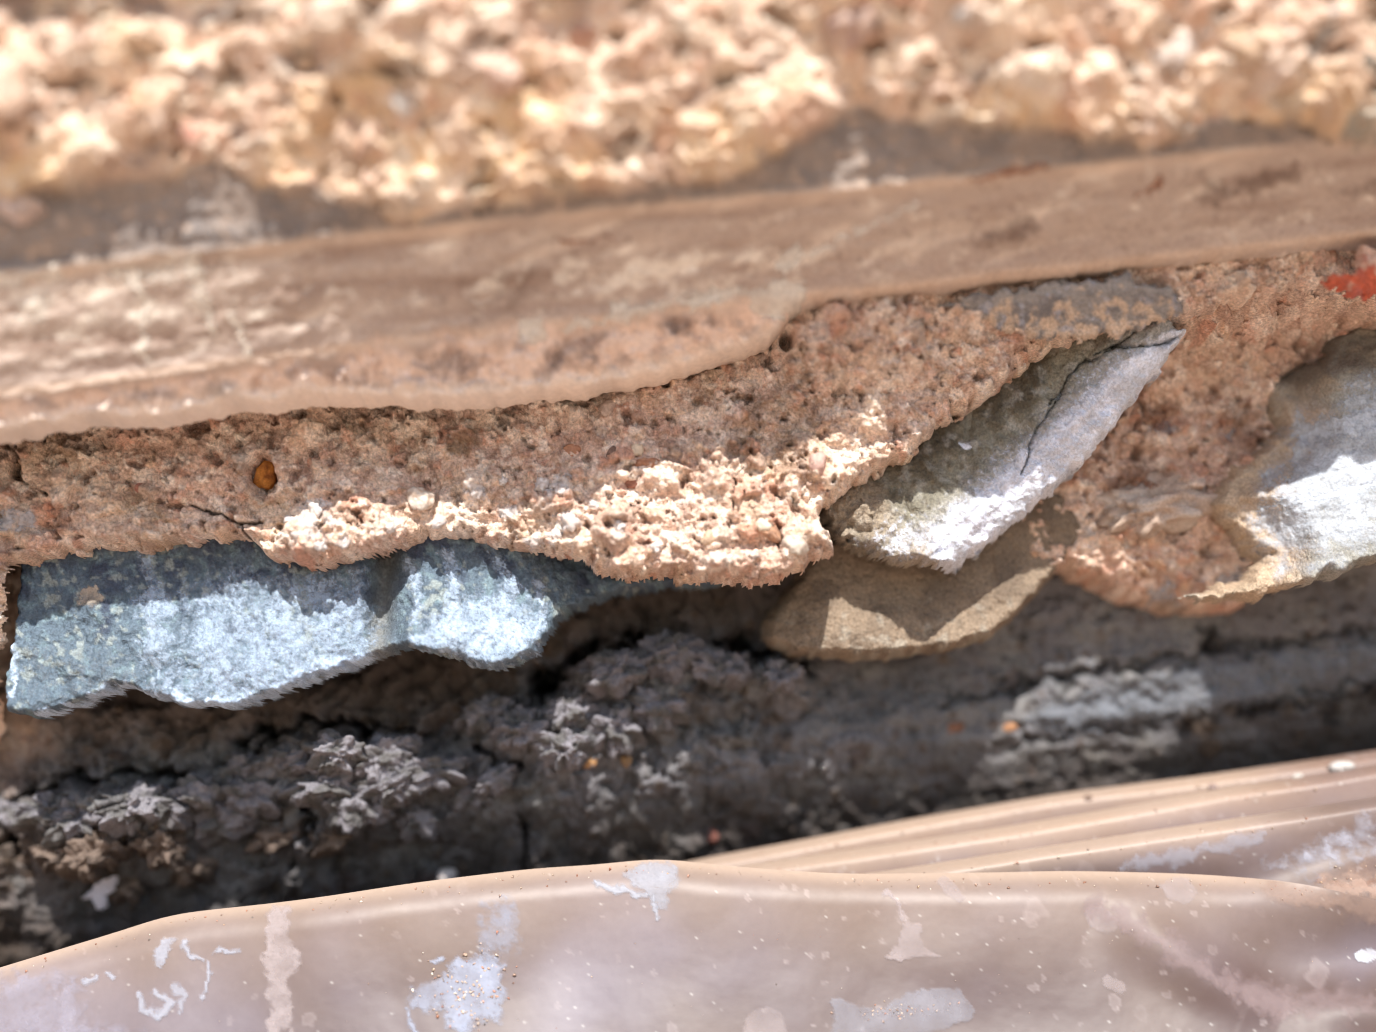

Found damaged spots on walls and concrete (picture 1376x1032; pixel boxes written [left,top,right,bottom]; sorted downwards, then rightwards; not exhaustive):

water stain [1321,875,1376,899]